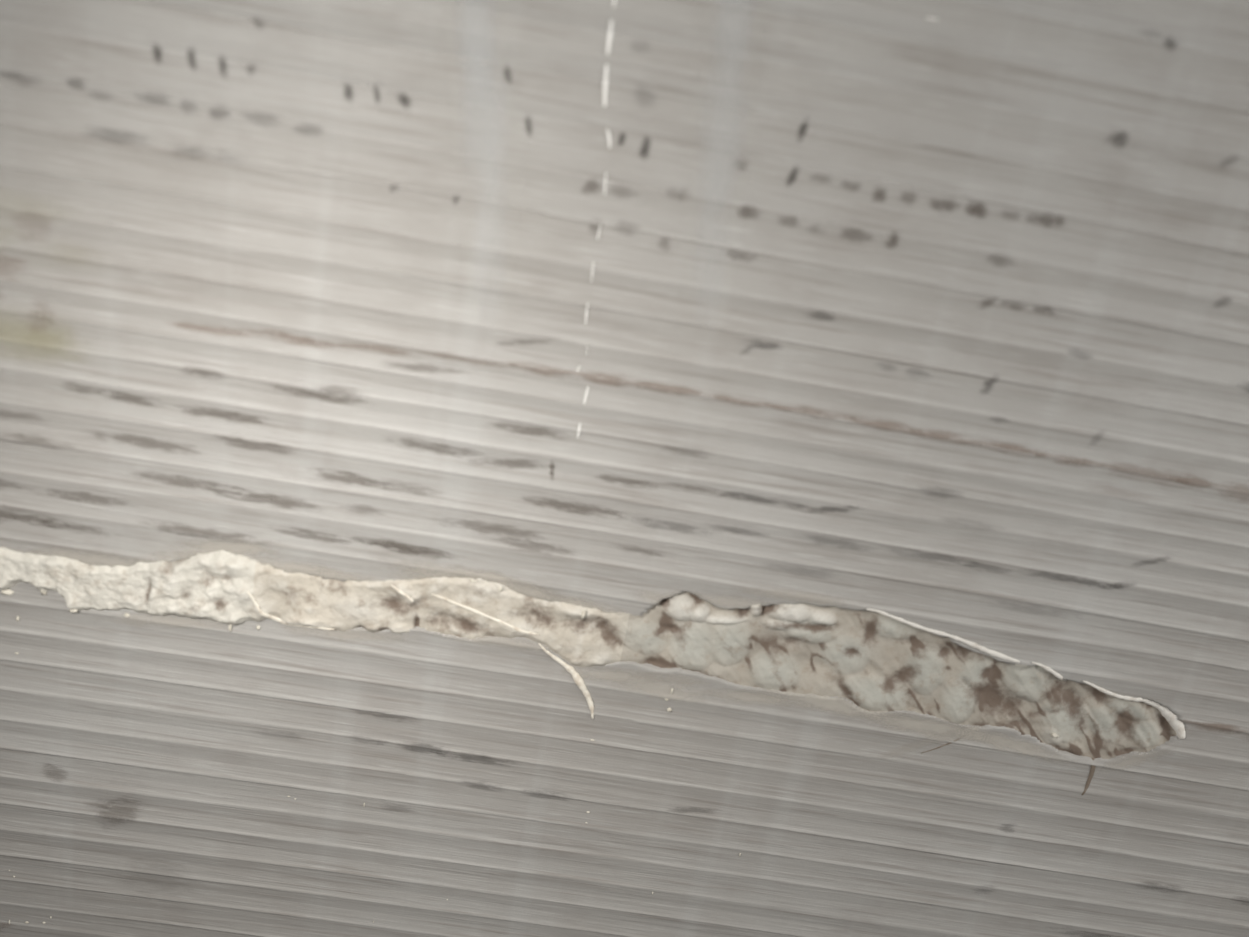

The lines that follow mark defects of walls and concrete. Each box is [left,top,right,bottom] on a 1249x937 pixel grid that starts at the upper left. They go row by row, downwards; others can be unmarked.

spalling [0,542,1186,795]